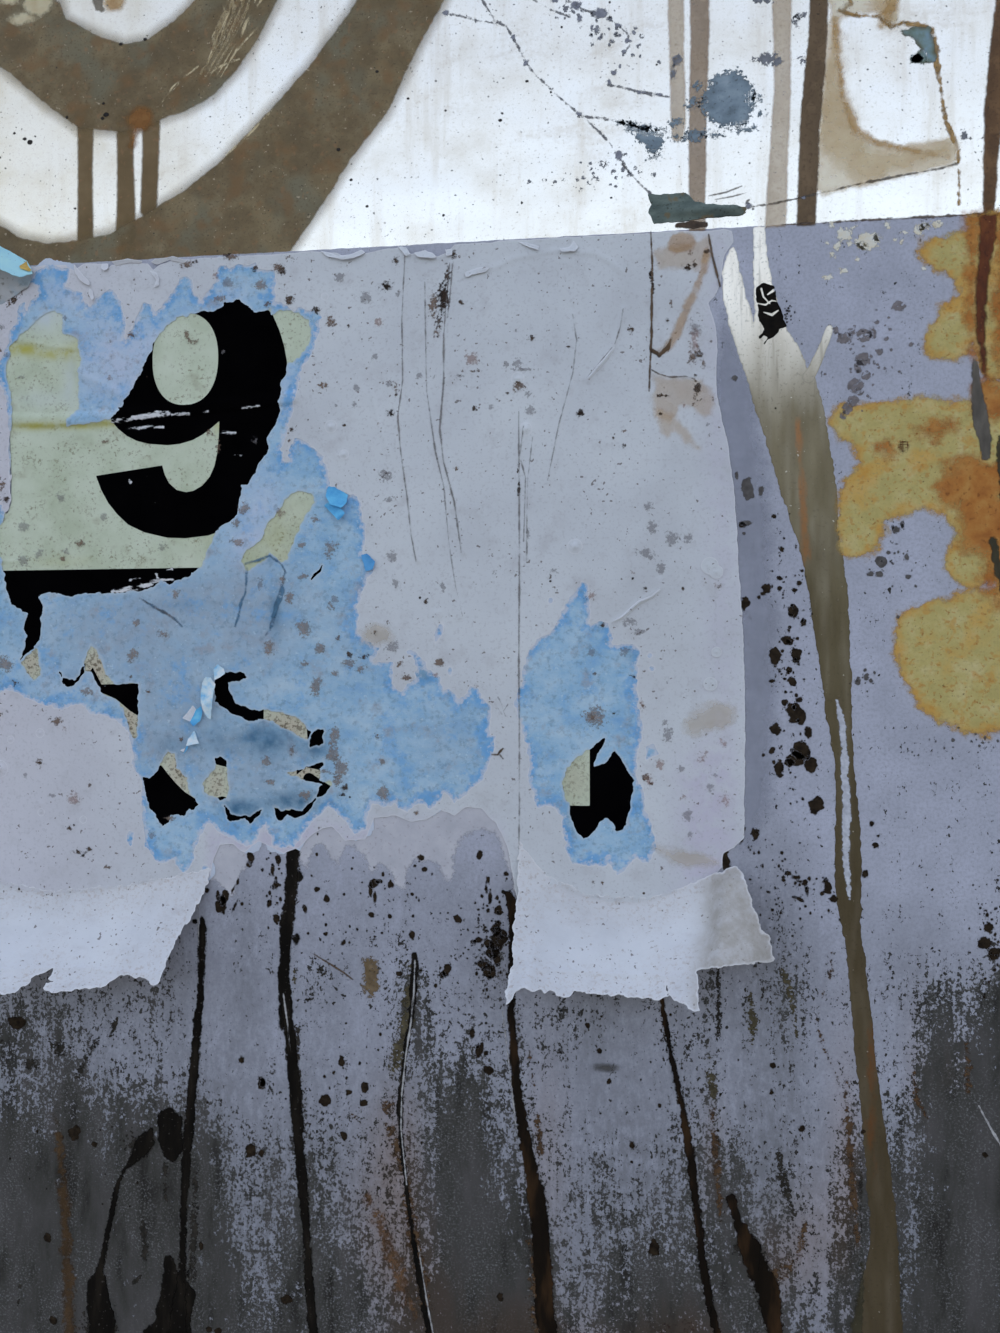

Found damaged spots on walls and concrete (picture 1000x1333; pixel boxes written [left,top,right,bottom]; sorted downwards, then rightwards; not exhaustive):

peeling [527,52,806,191]
peeling [648,193,747,229]
leakage [834,0,960,205]
peeling [867,521,917,587]
rust [828,209,1000,739]
leakage [86,916,206,1333]
leakage [278,849,318,1333]
peeling [302,857,394,943]
leakage [502,890,516,976]
leakage [507,994,557,1333]
leakage [660,998,721,1333]
peeling [722,226,906,1333]